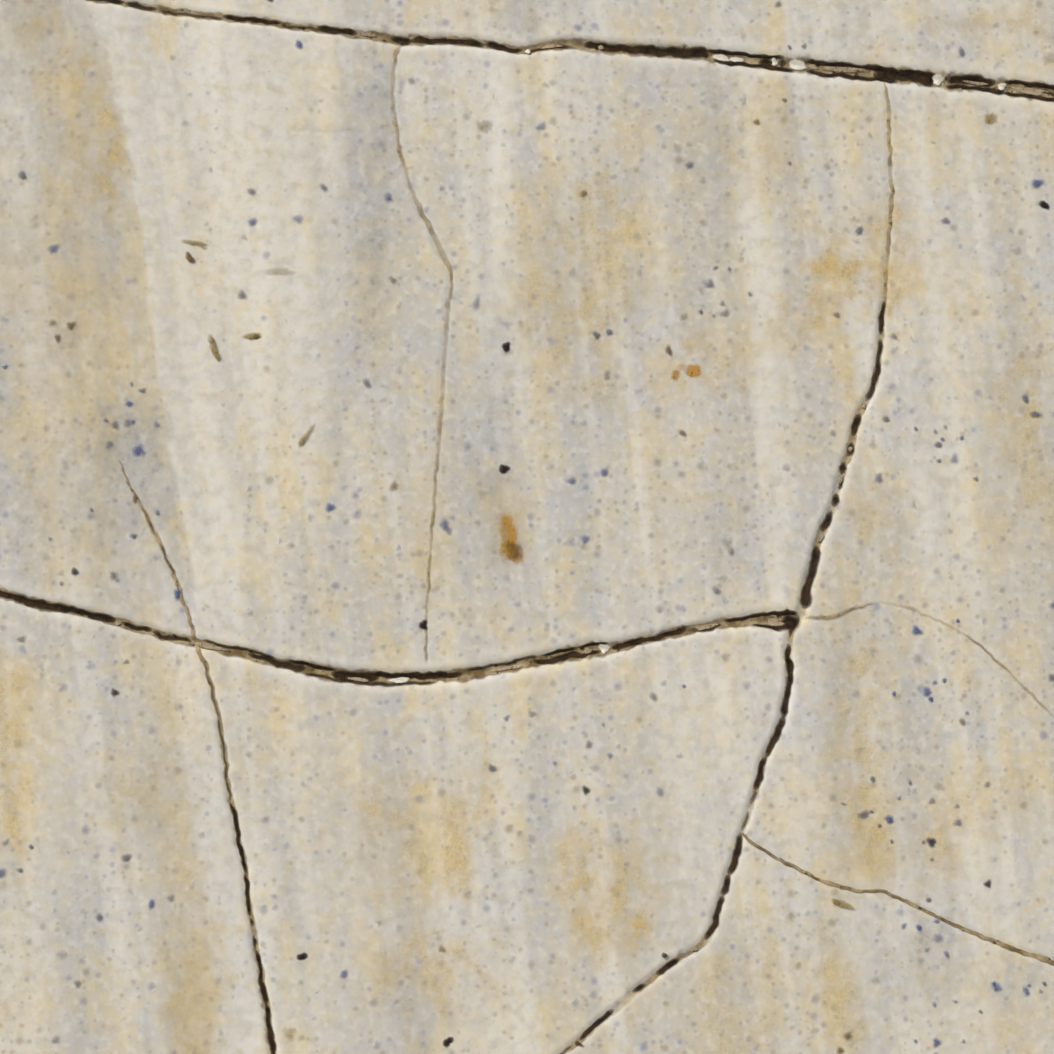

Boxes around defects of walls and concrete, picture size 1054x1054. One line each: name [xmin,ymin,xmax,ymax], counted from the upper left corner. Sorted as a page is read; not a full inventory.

crack [91,0,1054,164]
crack [419,207,434,233]
crack [886,184,894,255]
crack [444,261,452,294]
corrosion [502,517,519,561]
crack [0,272,1054,1054]